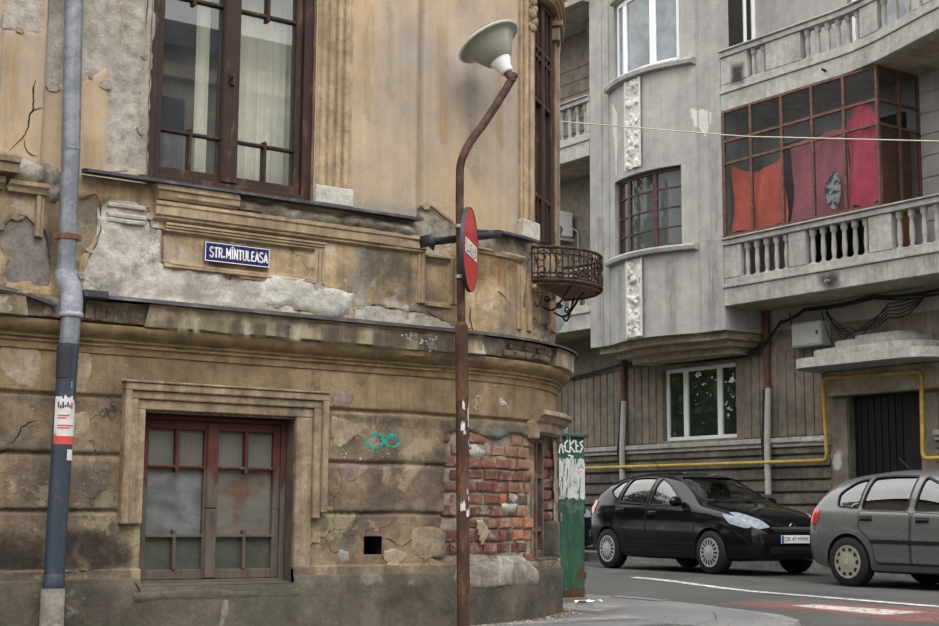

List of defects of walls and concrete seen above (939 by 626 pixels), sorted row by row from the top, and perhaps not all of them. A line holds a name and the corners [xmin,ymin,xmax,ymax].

crack [9,80,40,156]
flaking render [1,0,64,92]
flaking render [82,0,155,175]
spalling [0,212,52,286]
spalling [76,194,101,279]
spalling [145,207,188,267]
peeling [0,347,43,389]
crack [0,420,35,454]
flaking render [384,432,457,565]
flaking render [469,432,534,562]